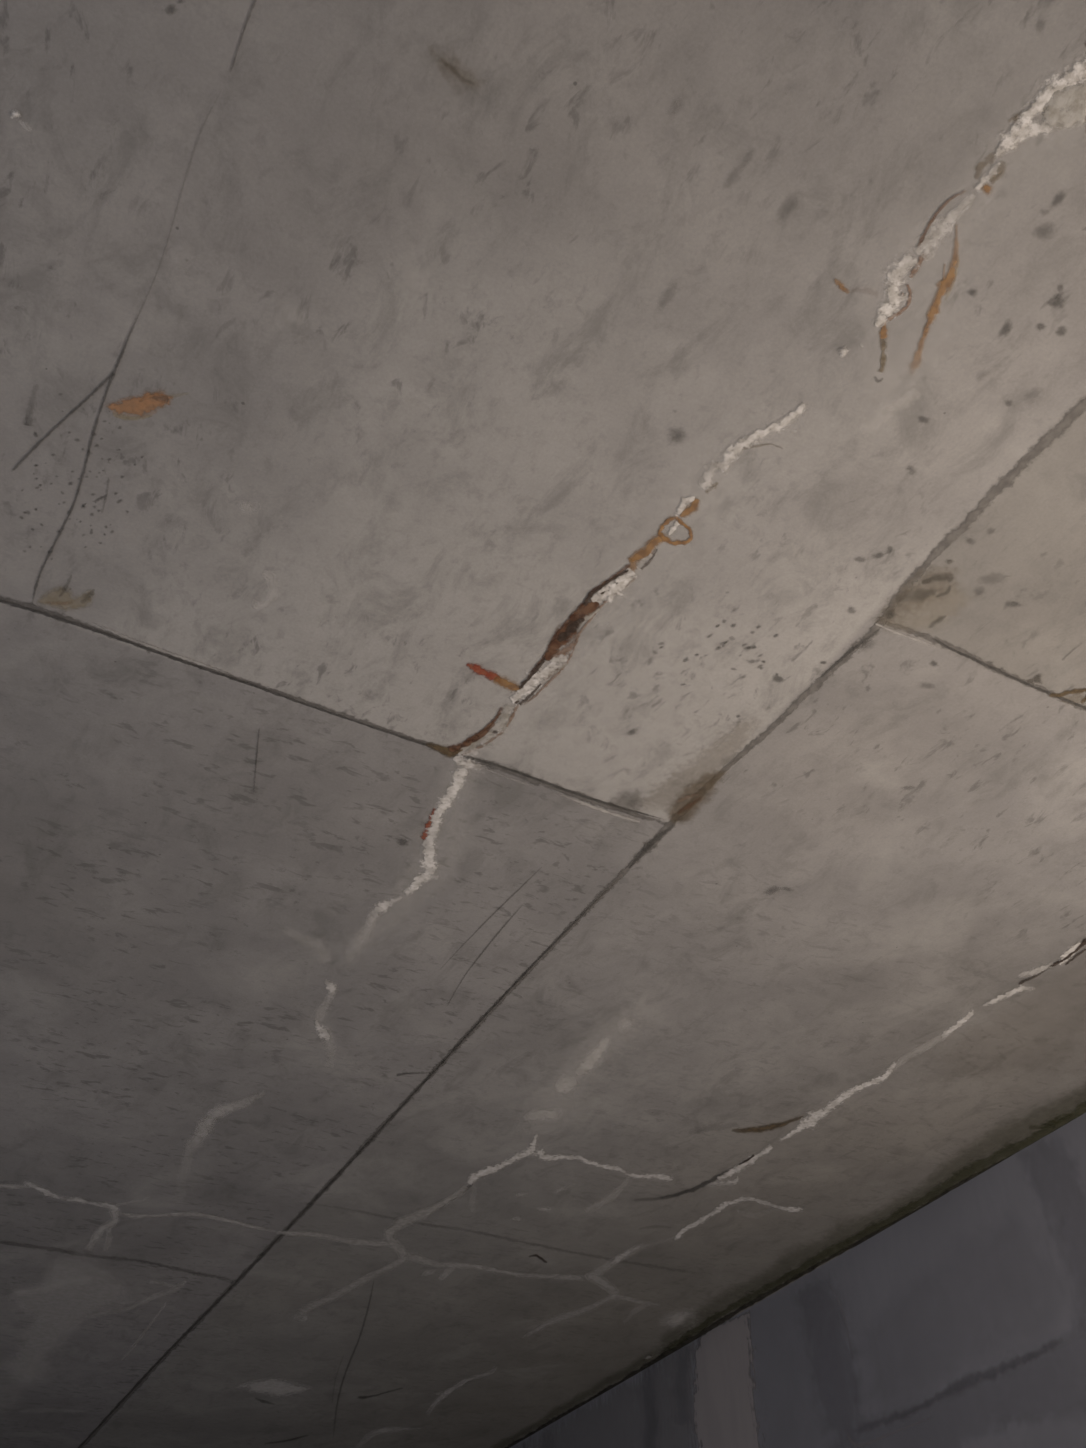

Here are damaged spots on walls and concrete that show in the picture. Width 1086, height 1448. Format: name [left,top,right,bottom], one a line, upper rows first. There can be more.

crack [875,57,1086,372]
corrosion [466,663,522,691]
crack [372,403,805,915]
crack [942,939,1086,1038]
crack [31,1184,118,1212]
crack [467,1062,896,1241]
crack [436,1378,471,1402]